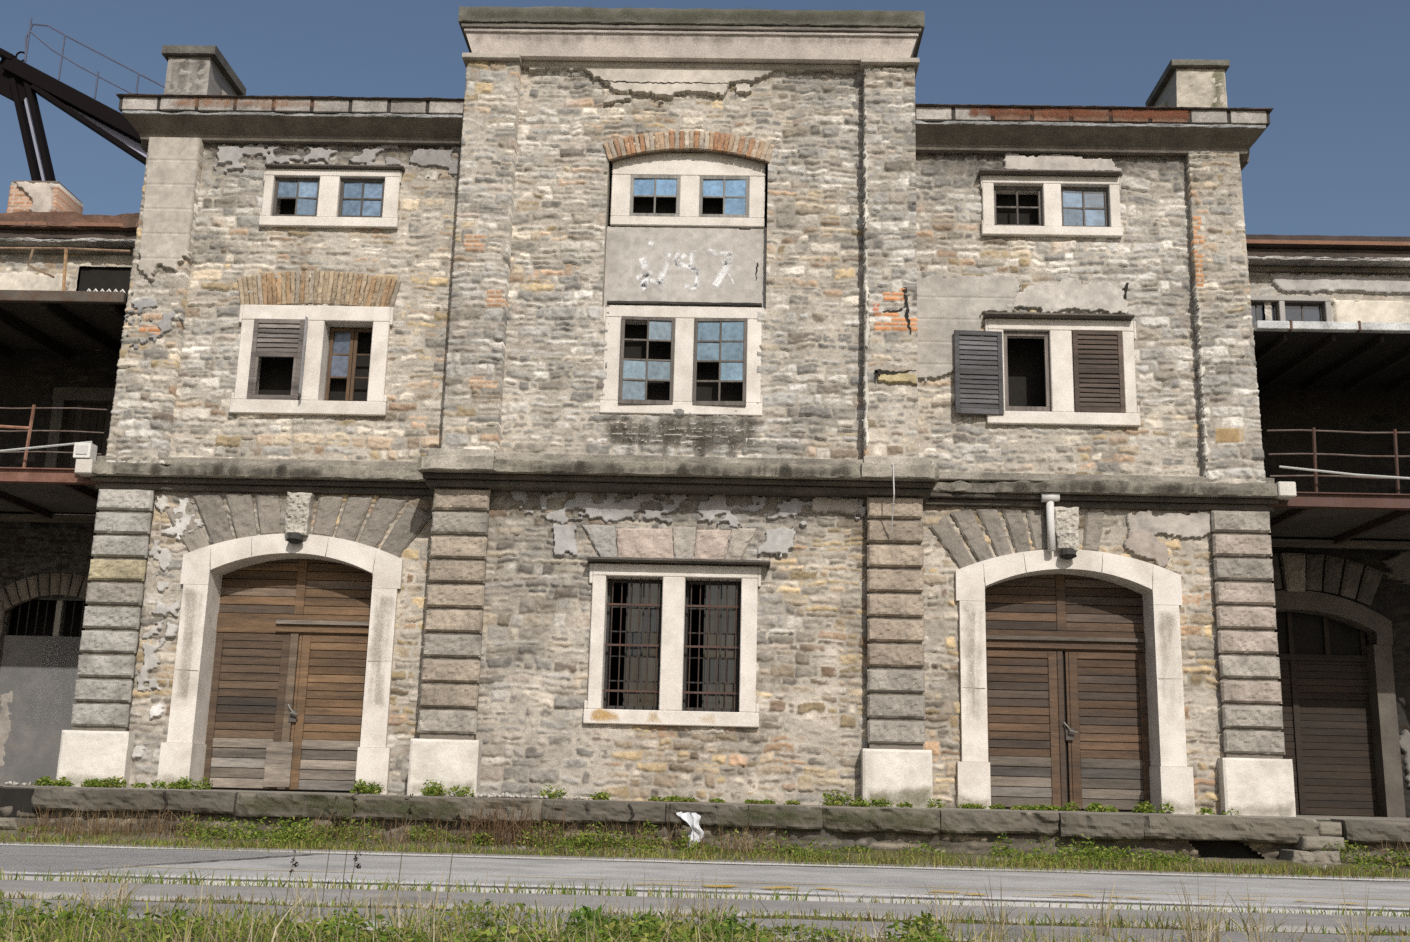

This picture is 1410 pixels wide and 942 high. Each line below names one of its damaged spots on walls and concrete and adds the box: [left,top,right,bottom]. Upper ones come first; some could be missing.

peeling [917,274,1129,383]
peeling [1399,729,1410,787]